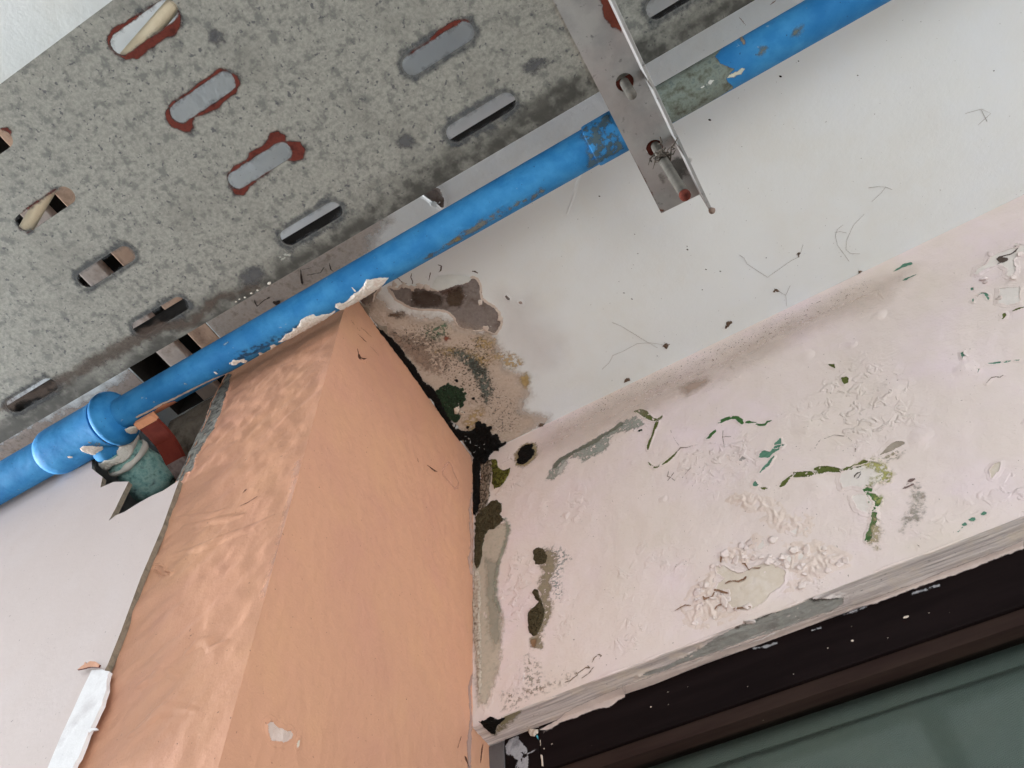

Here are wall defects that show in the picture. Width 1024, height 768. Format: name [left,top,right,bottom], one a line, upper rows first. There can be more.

flaking render [359,274,525,337]
peeling [967,241,1024,304]
leakage [366,296,547,516]
leakage [472,518,510,704]
peeling [634,479,853,679]
peeling [835,437,909,549]